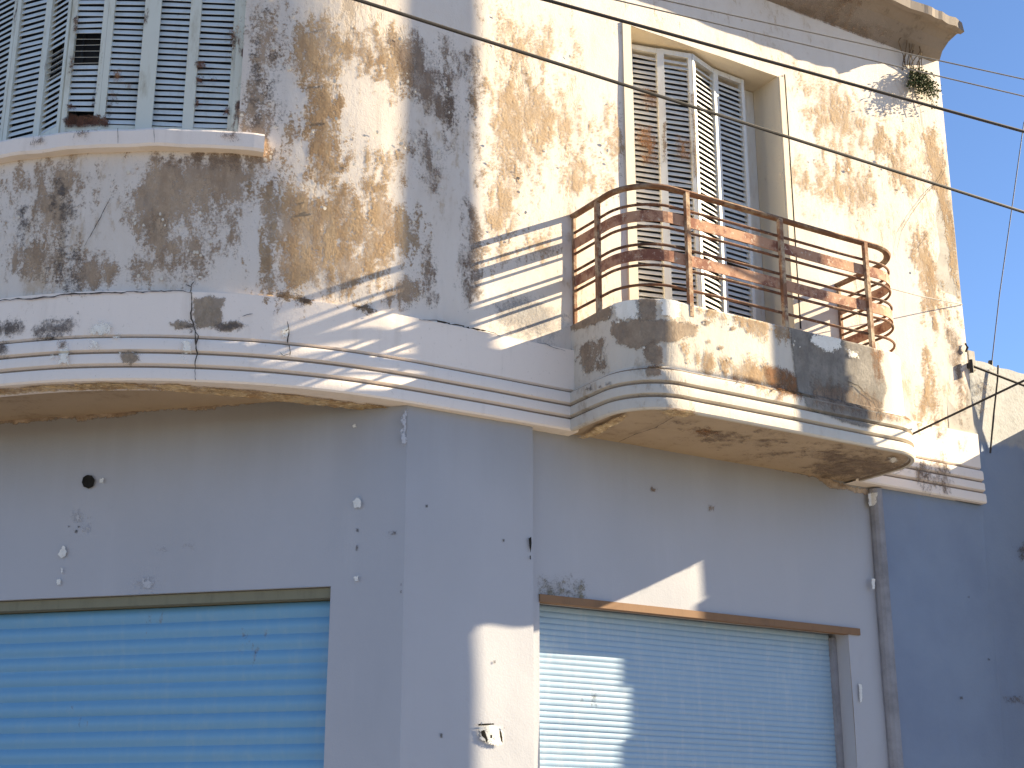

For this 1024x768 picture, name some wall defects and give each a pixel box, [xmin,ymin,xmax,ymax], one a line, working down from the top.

peeling [0,0,625,362]
peeling [789,62,965,331]
crack [0,282,199,380]
spalling [0,383,390,425]
leakage [216,323,242,331]
spalling [662,409,696,418]
peeling [570,298,859,400]
leakage [790,328,887,428]
peeling [914,345,939,434]